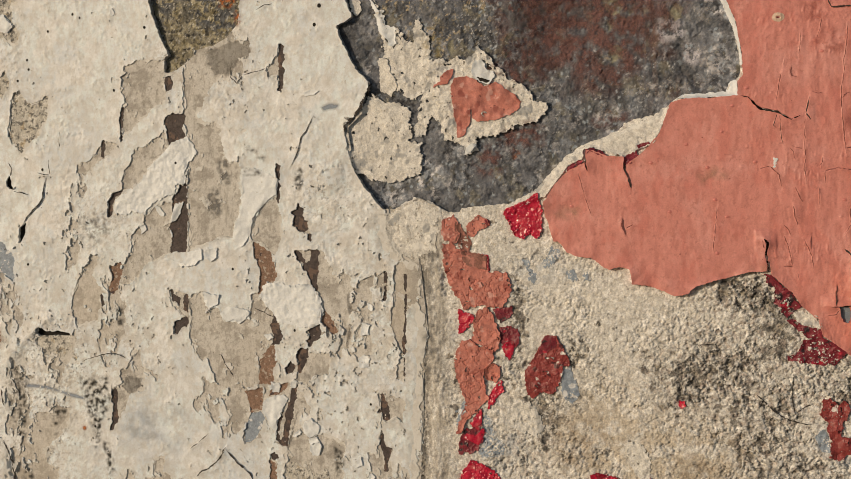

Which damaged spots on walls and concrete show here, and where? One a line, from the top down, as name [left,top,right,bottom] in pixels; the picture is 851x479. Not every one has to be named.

spalling [0,0,20,43]
spalling [0,72,48,153]
crack [743,0,851,277]
peeling [0,242,29,348]
peeling [37,0,422,479]
spalling [339,0,742,479]
peeling [764,274,847,366]
peeling [5,360,71,479]